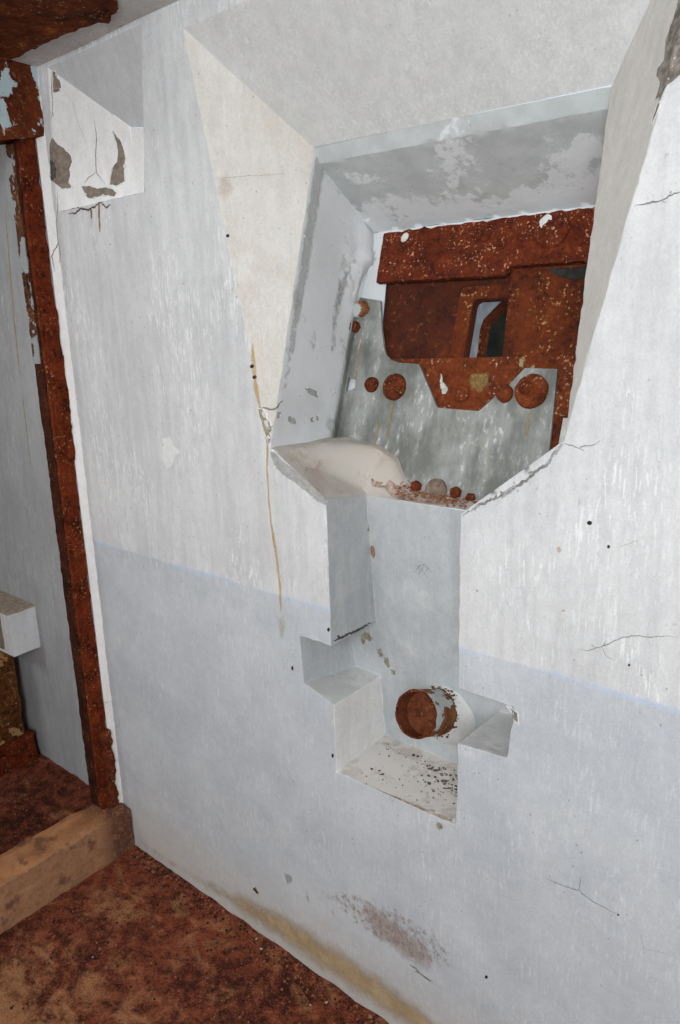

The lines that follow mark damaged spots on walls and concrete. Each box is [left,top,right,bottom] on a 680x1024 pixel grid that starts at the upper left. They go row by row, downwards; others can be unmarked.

spalling [650,0,680,127]
crack [51,85,111,270]
spalling [49,130,126,200]
rust [371,478,465,505]
crack [463,441,600,516]
crack [334,622,372,641]
crack [580,635,677,661]
rust [395,689,437,739]
damp [236,896,430,1024]